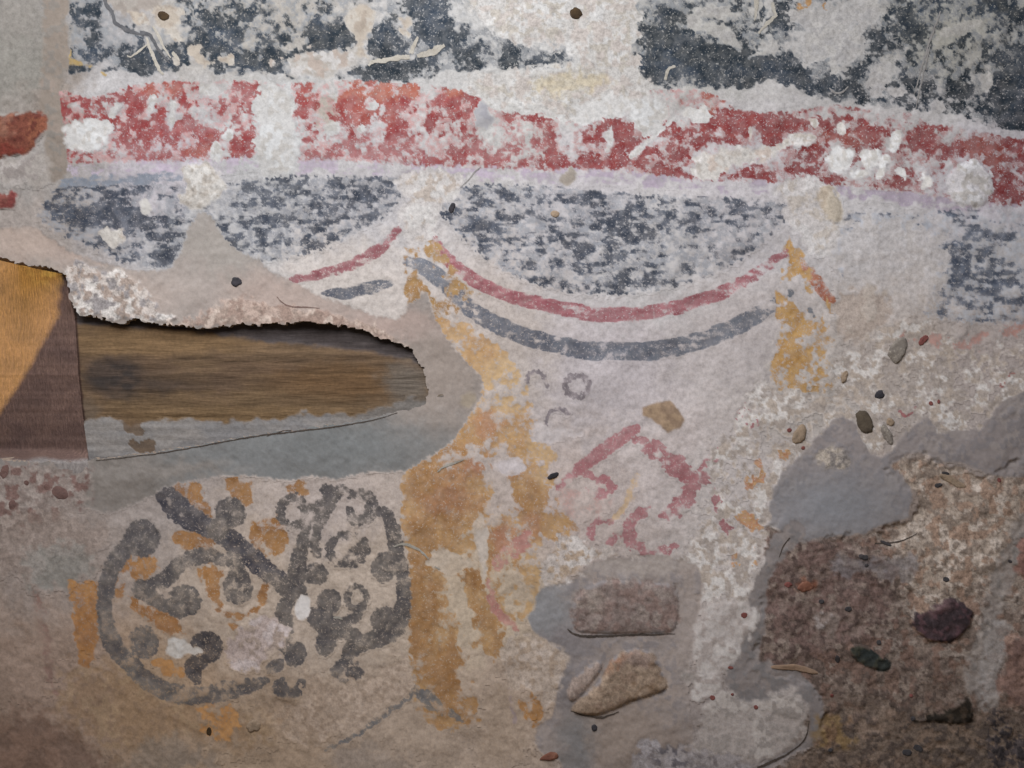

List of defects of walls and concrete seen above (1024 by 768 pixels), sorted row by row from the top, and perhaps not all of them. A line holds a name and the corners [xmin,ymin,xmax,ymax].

flaking render [63,257,412,348]
flaking render [629,116,1024,768]